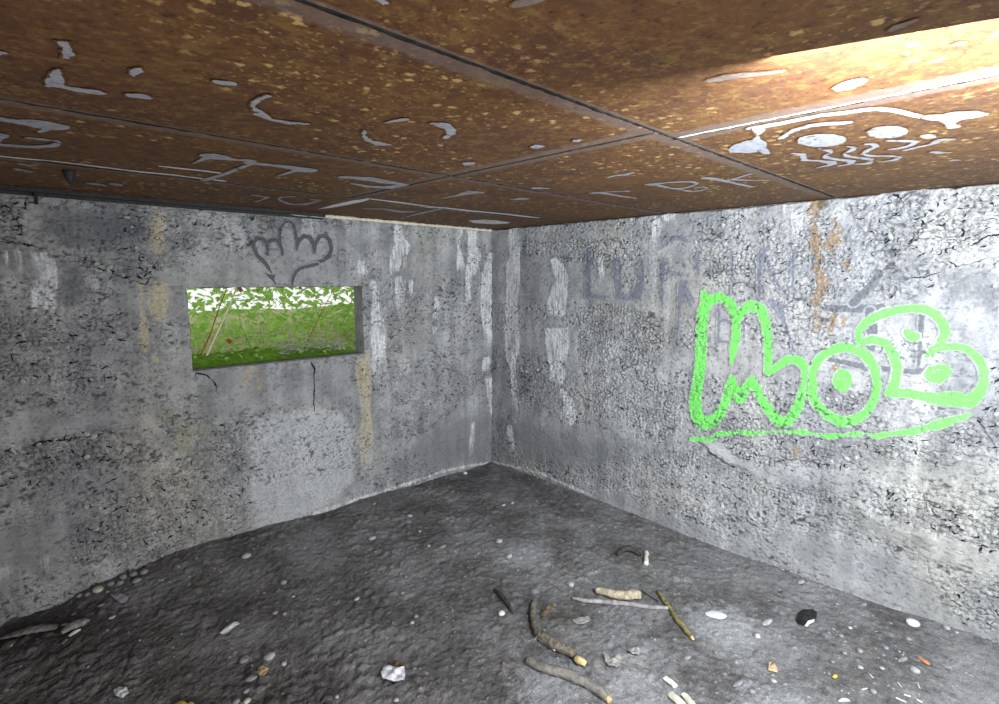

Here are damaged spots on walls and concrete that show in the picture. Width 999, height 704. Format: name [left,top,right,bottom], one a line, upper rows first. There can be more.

leakage [648,213,677,257]
corrosion [803,199,855,343]
crack [309,362,317,412]
leakage [372,227,772,494]